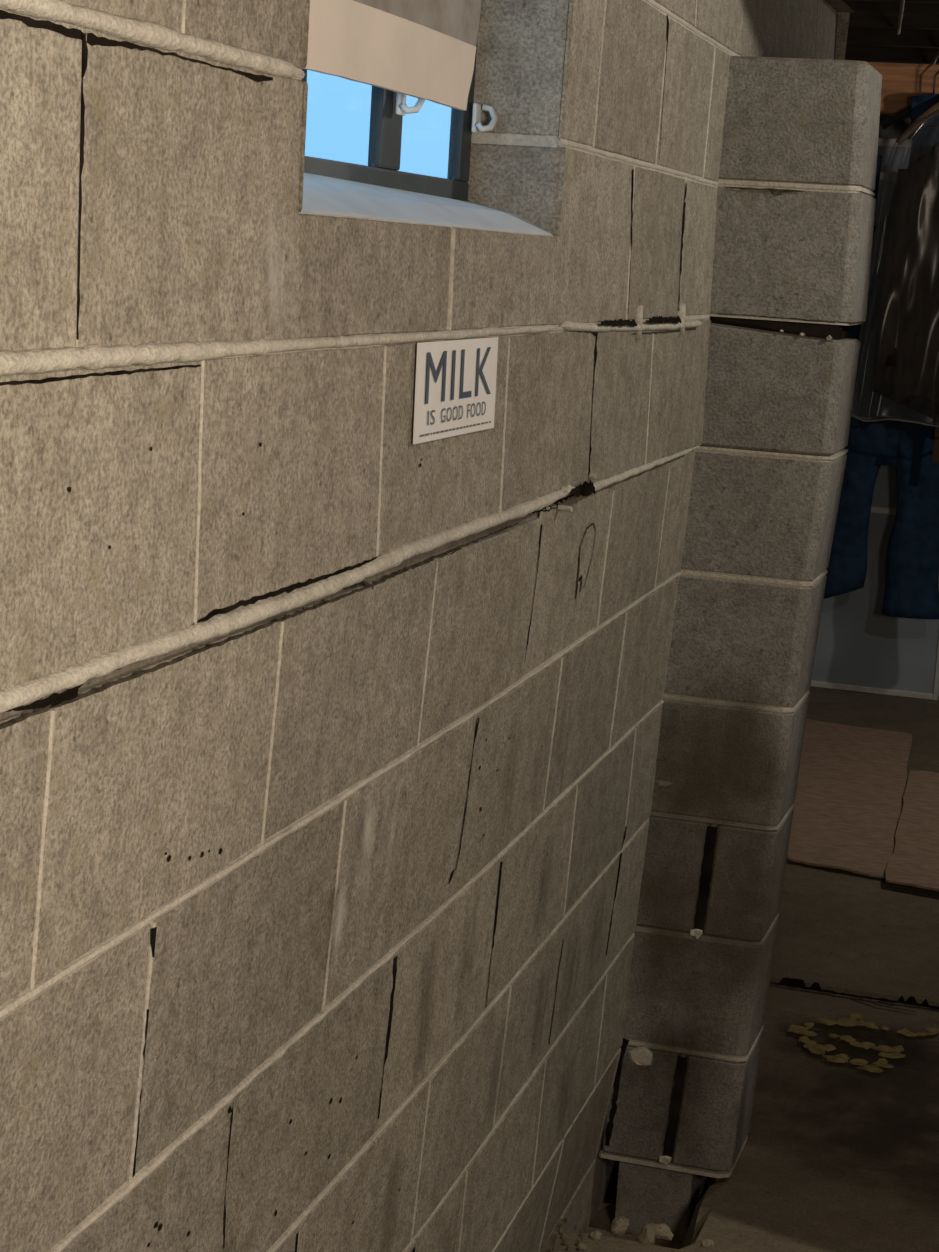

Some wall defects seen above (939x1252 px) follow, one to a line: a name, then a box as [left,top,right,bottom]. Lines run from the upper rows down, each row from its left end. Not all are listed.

crack [0,10,843,729]
crack [770,977,939,1012]